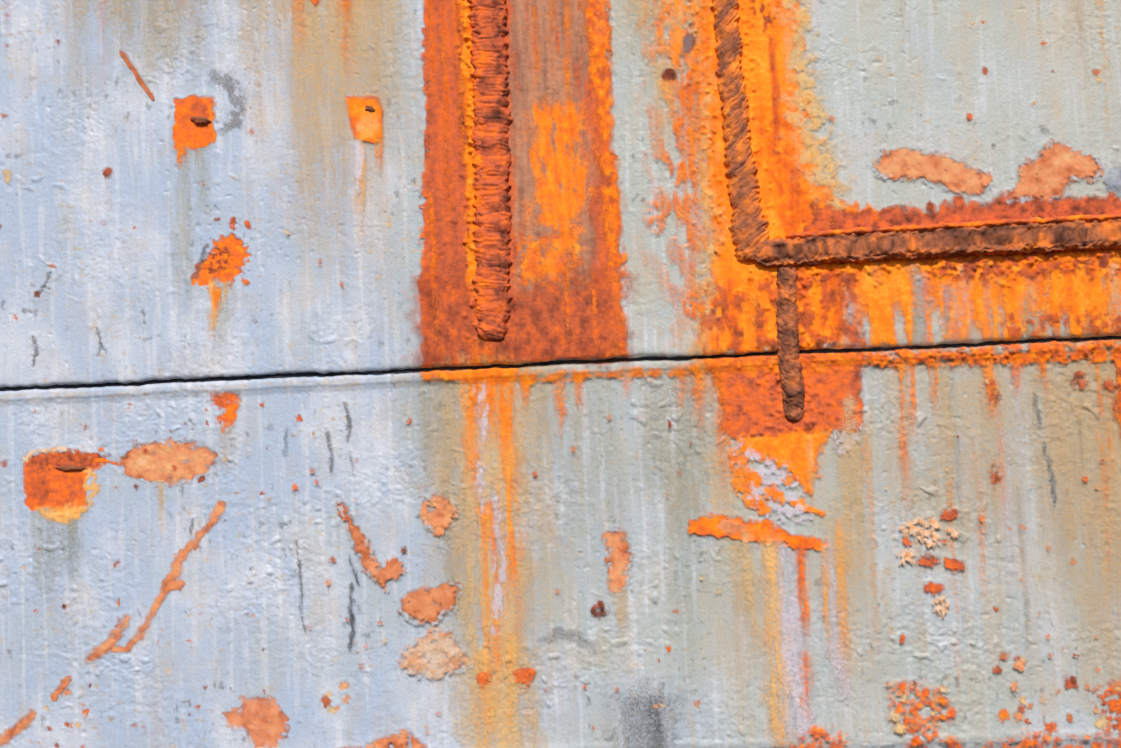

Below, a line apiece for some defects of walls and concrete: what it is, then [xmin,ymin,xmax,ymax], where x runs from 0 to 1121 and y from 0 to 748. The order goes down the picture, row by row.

corrosion [172,92,217,169]
corrosion [345,94,384,254]
peeling [872,138,1121,206]
corrosion [190,216,261,343]
peeling [414,491,459,536]
peeling [335,499,475,680]
corrosion [344,725,435,748]